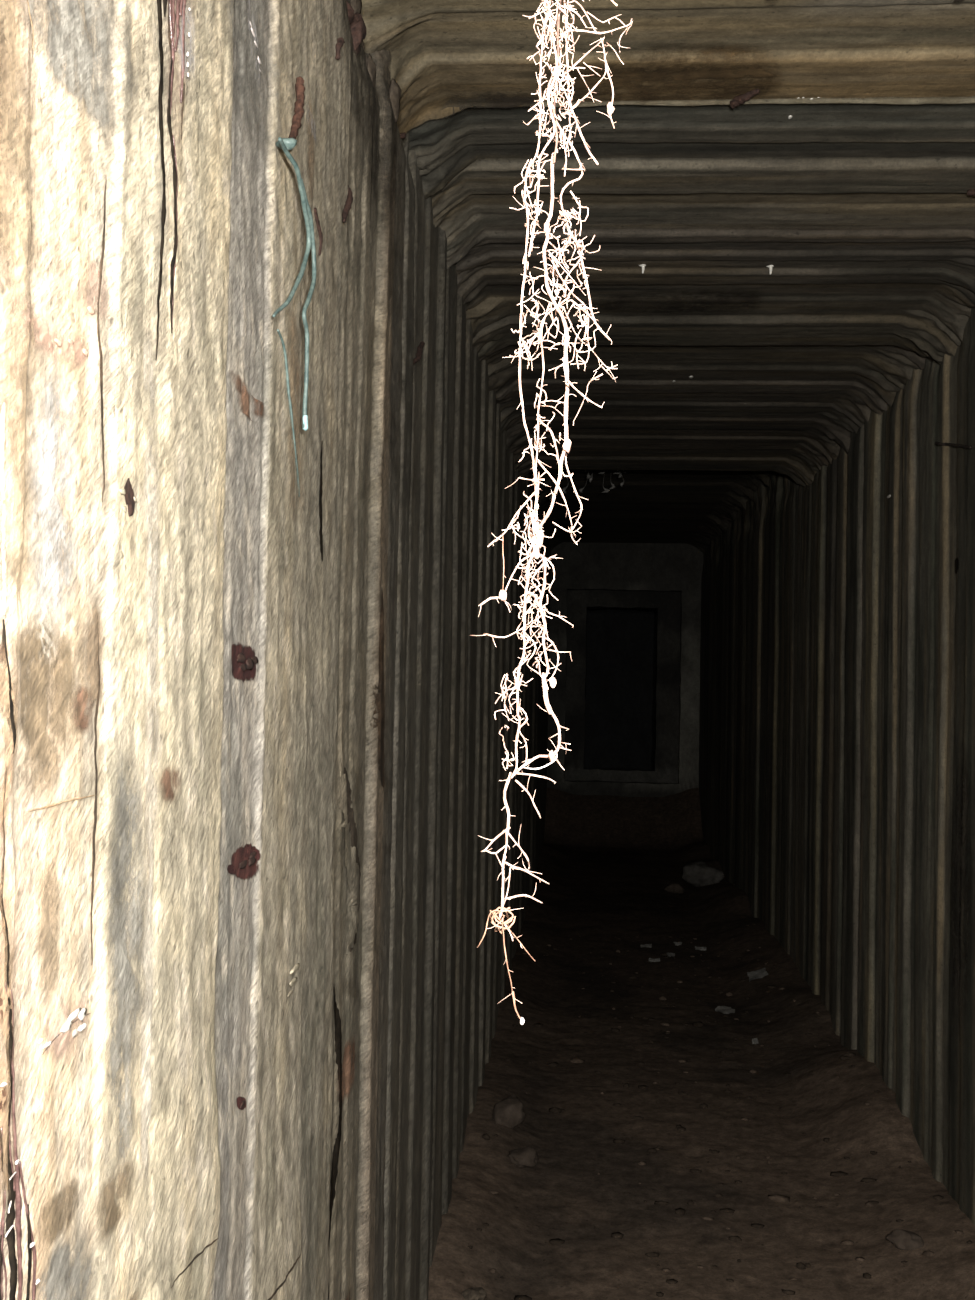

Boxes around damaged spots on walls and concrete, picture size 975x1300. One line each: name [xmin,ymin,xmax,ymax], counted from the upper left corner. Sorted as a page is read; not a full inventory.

crack [156,0,185,360]
crack [97,178,107,502]
rust [236,377,264,419]
crack [317,441,325,561]
rust [232,643,258,682]
rust [227,843,261,880]
crack [0,616,100,1300]
rust [237,1096,246,1110]
crack [268,986,355,1300]